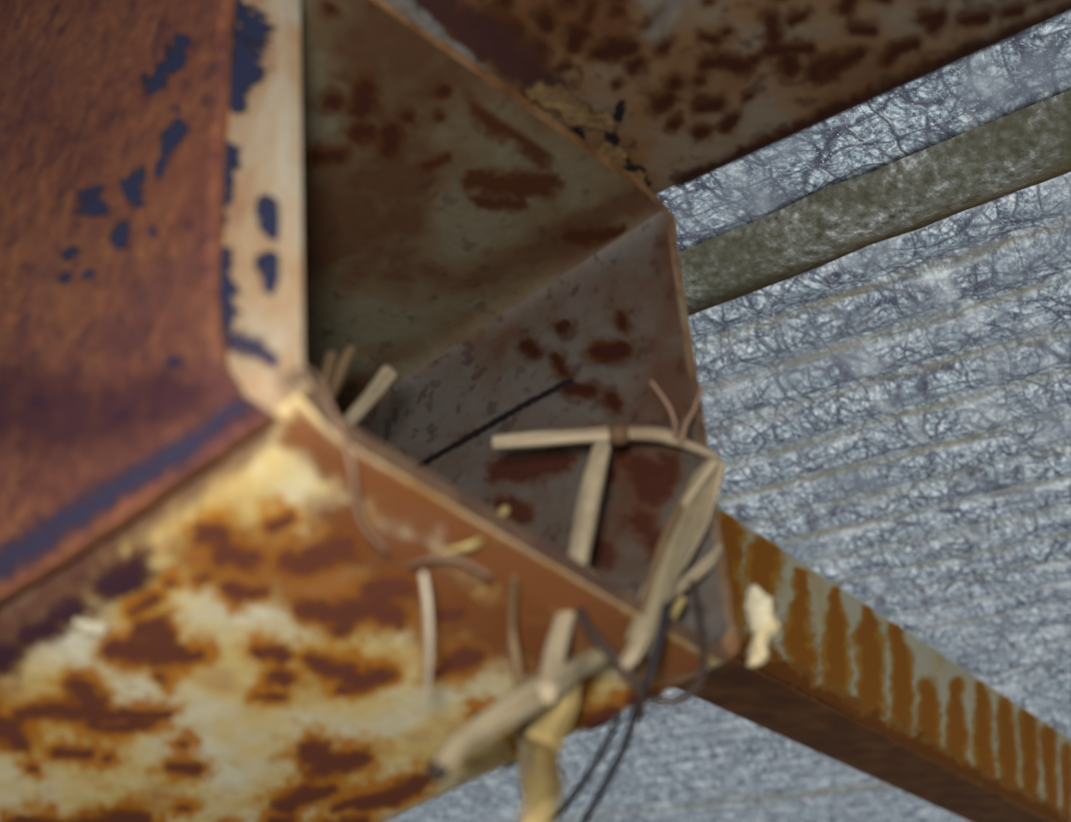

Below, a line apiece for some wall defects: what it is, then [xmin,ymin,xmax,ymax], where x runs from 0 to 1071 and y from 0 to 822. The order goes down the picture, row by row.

peeling [140,33,192,98]
peeling [229,0,278,114]
rust [416,0,679,98]
rust [651,0,1071,187]
peeling [119,105,190,209]
rust [461,100,564,212]
peeling [57,245,96,284]
peeling [74,184,131,250]
peeling [219,140,280,369]
rust [0,410,634,822]
rust [567,634,700,734]
rust [718,512,1071,822]